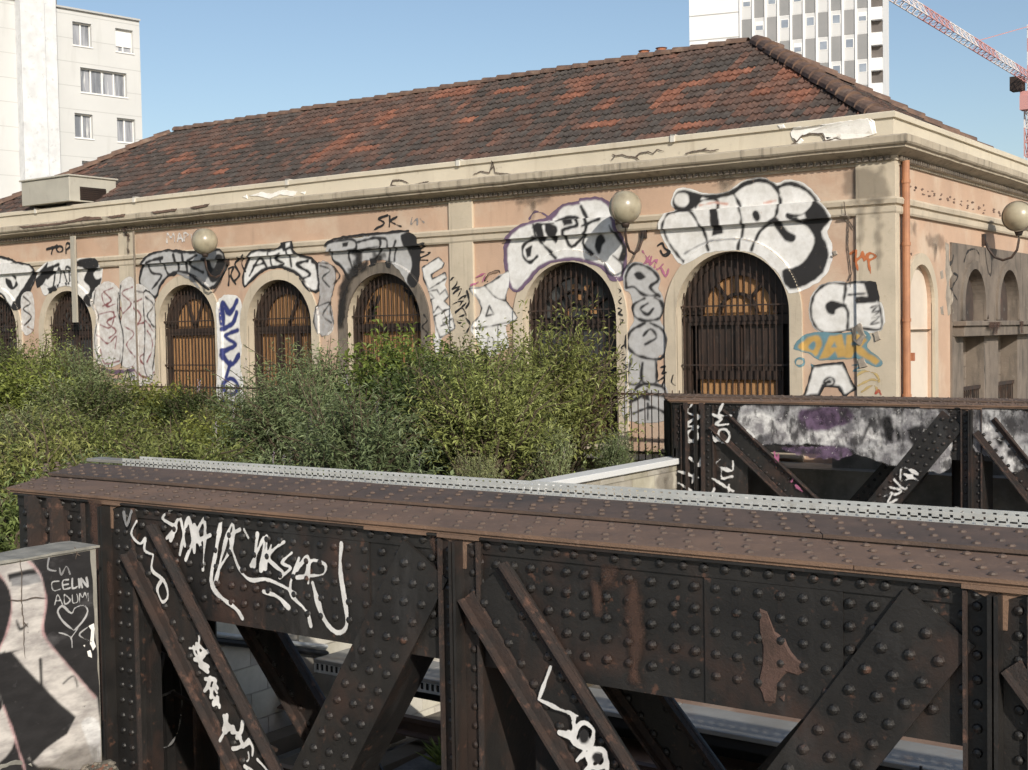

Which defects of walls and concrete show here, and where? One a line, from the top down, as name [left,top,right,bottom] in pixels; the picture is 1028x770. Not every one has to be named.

crack [611,148,719,160]
peeling [778,118,877,144]
corrosion [592,566,617,615]
corrosion [627,582,644,683]